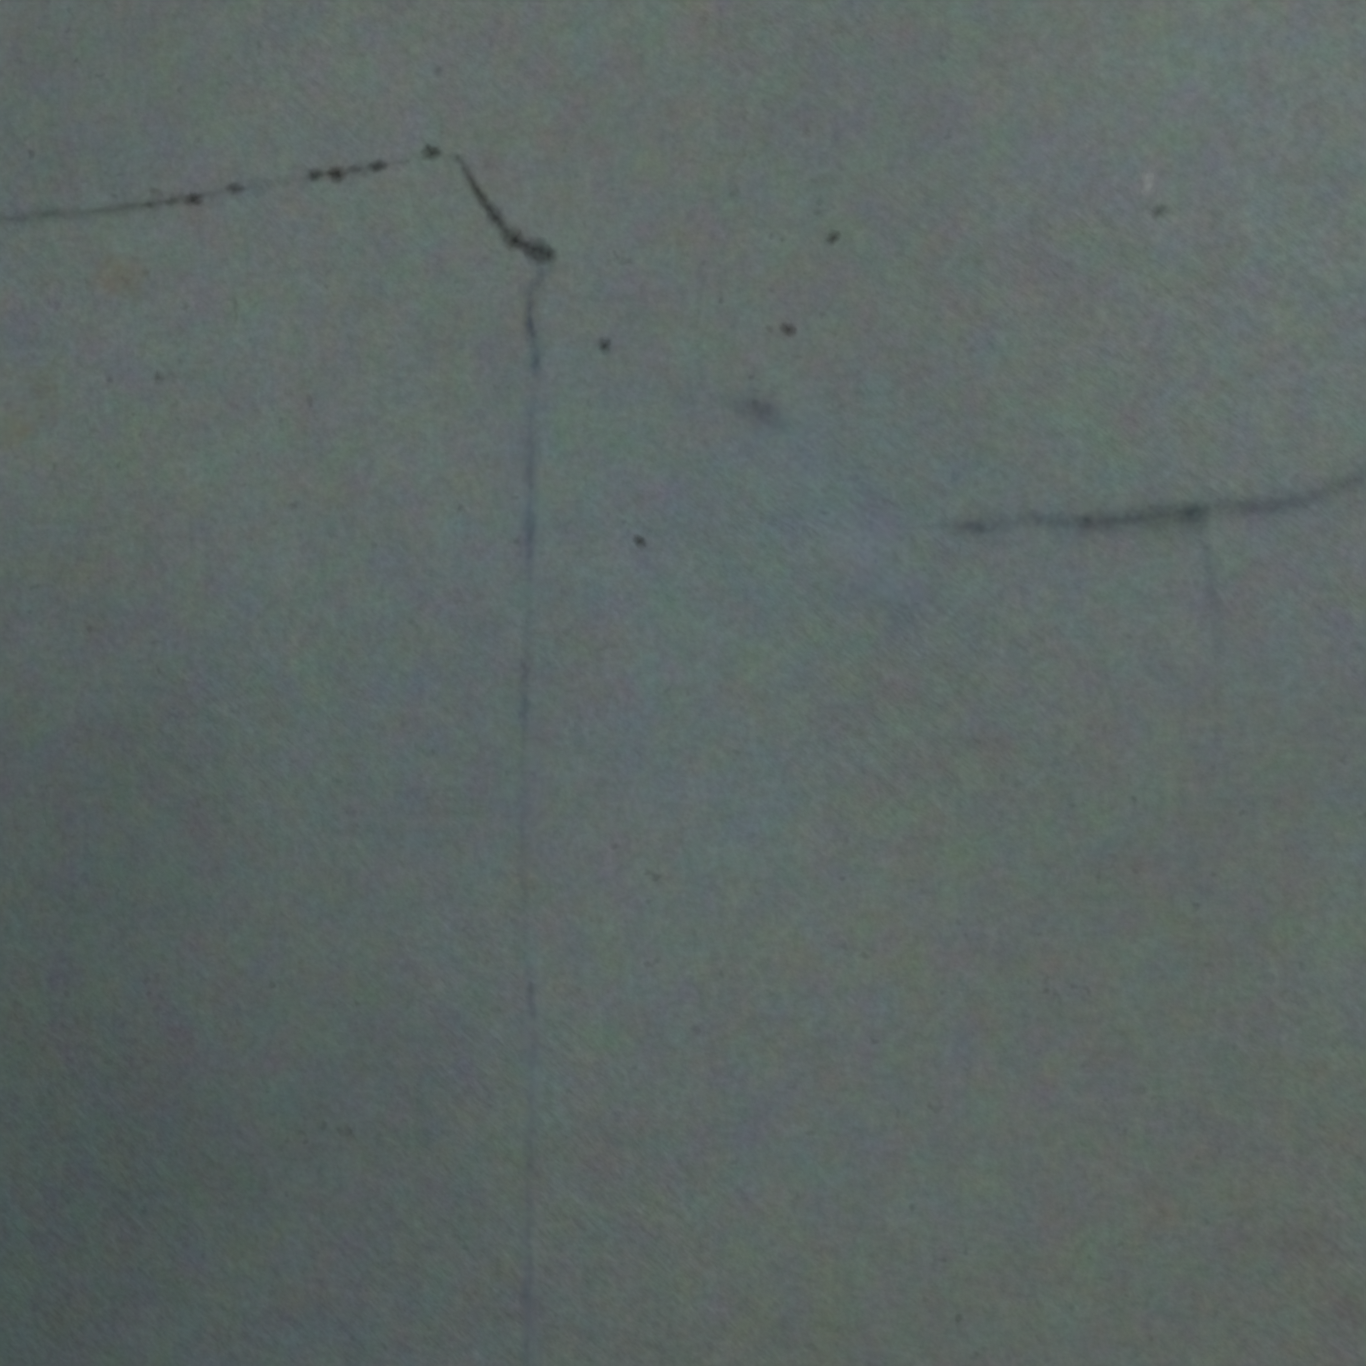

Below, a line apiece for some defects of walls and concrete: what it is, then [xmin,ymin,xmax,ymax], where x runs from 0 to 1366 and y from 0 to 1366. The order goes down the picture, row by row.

crack [473,184,551,257]